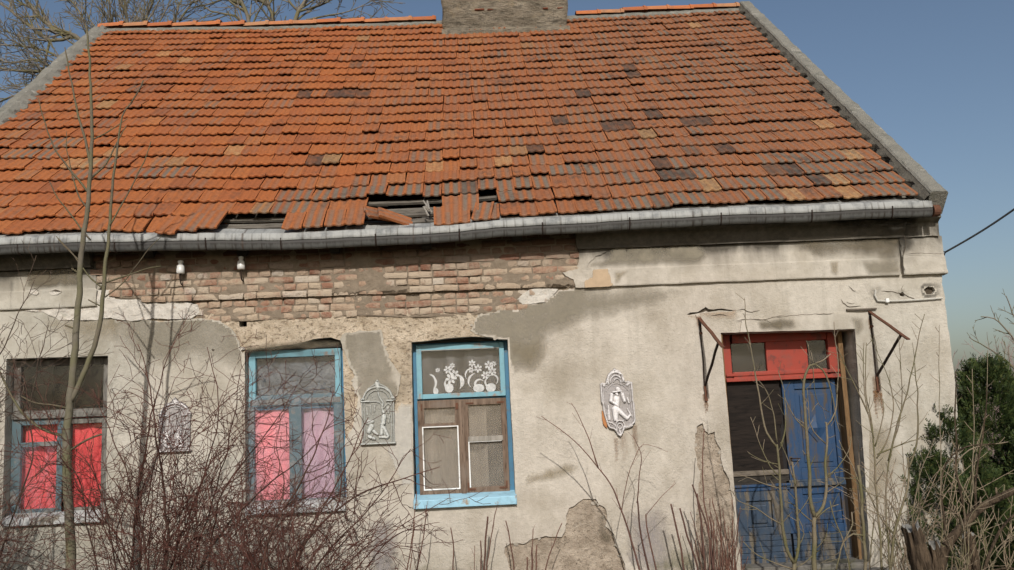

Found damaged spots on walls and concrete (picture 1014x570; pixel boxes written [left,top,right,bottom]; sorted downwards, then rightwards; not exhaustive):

flaking render [90,233,579,439]
crack [687,287,858,322]
spalling [504,499,625,570]
spalling [694,424,734,570]